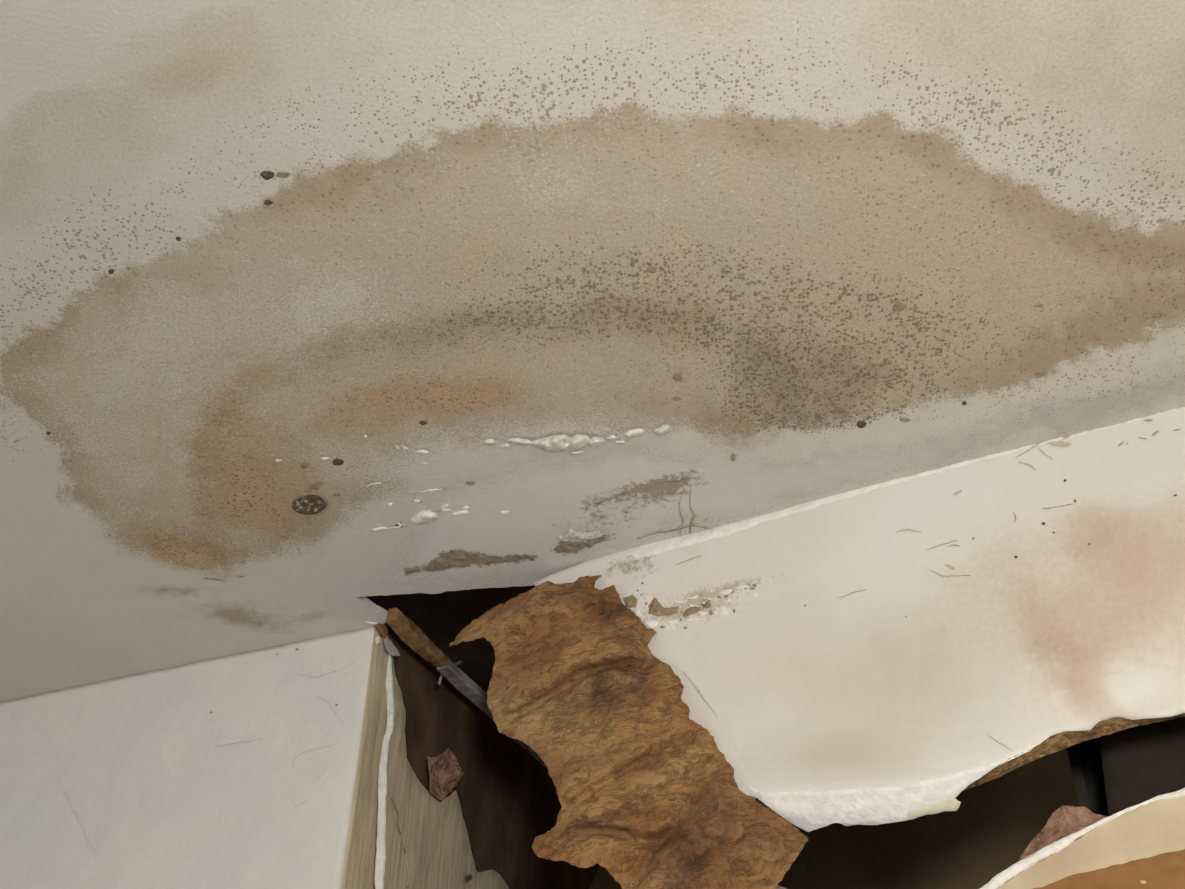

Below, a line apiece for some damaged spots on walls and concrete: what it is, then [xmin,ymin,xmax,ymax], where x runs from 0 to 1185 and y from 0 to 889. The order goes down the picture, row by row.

damp [0,105,1185,571]
spalling [404,529,615,574]
peeling [622,582,757,629]
spalling [367,622,388,644]